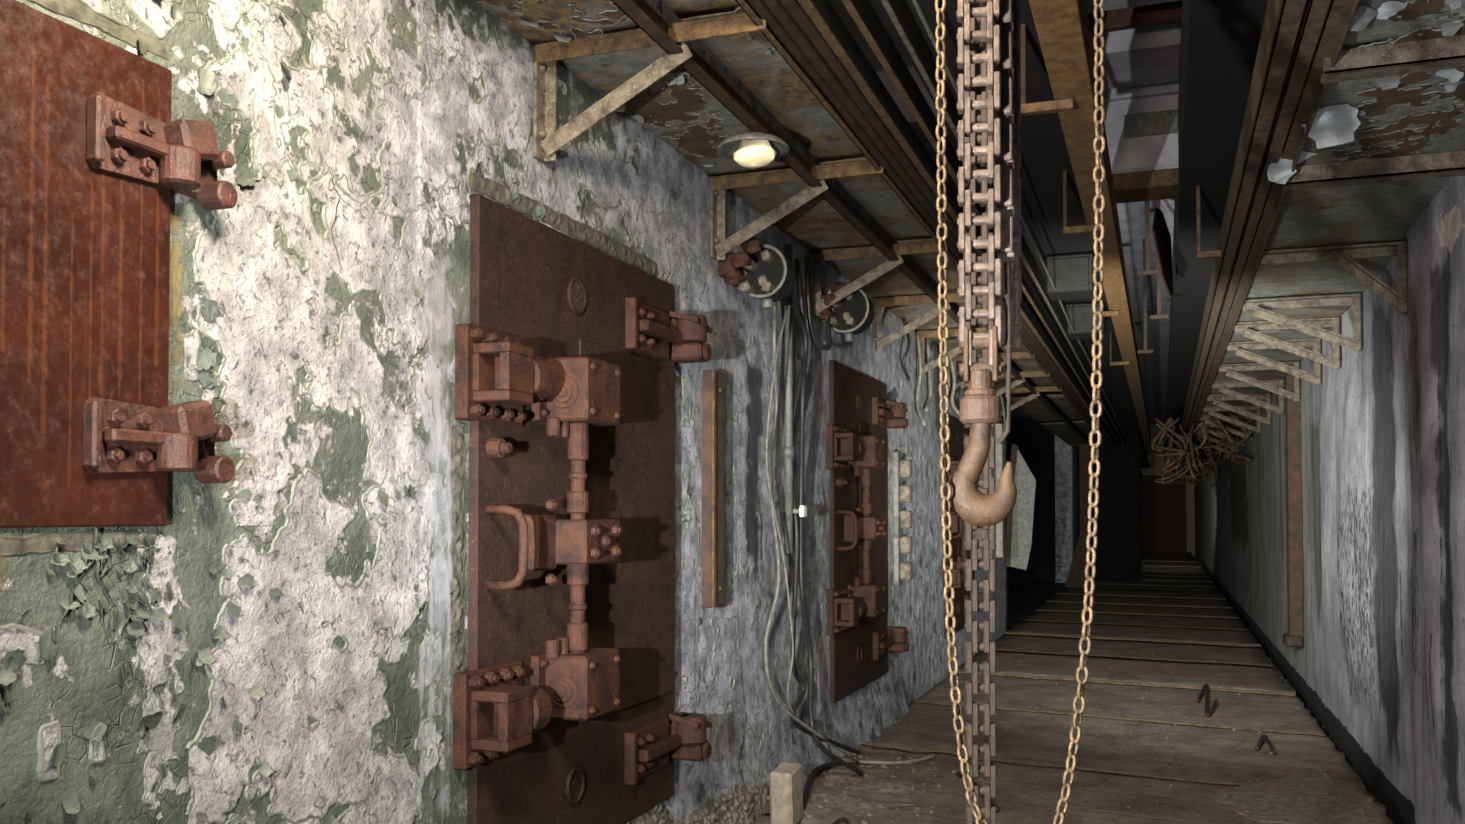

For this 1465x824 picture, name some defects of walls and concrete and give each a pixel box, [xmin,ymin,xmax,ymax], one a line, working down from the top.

peeling [746,30,778,55]
peeling [1267,69,1465,184]
peeling [1349,0,1465,54]
peeling [0,0,729,824]
peeling [623,323,777,824]
peeling [793,342,826,733]
leakage [1310,254,1462,814]